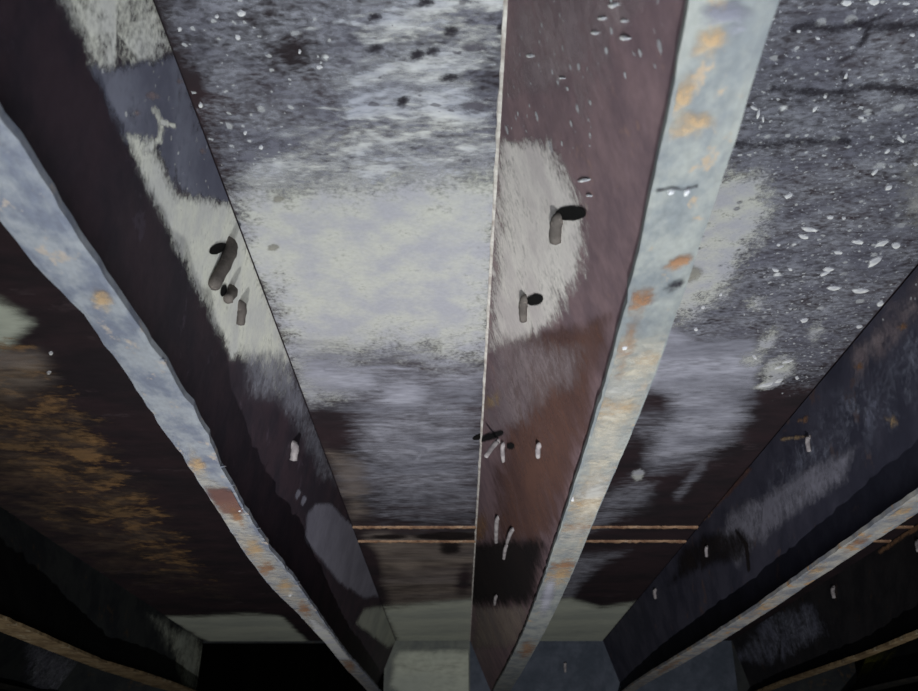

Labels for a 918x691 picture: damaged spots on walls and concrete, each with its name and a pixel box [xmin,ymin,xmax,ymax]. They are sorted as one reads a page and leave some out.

efflorescence [65,0,171,71]
crack [791,16,918,47]
crack [771,72,918,96]
crack [736,138,850,148]
leakage [127,0,587,504]
corrosion [668,257,690,269]
efflorescence [560,0,918,542]
leakage [0,305,31,348]
corrosion [0,396,196,577]
corrosion [190,460,314,626]
leakage [309,618,350,660]